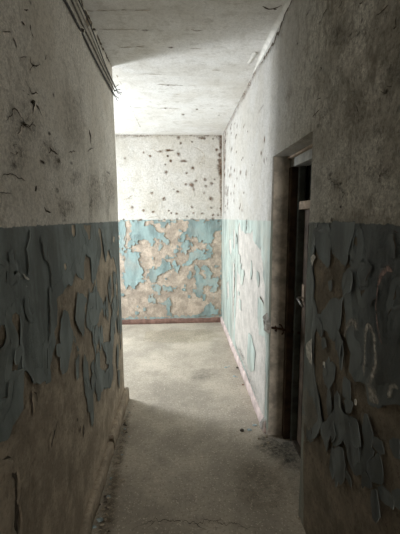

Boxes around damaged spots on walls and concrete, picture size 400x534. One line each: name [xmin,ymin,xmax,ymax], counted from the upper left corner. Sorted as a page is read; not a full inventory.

crack [23,82,42,116]
peeling [0,219,271,534]
peeling [303,221,400,534]